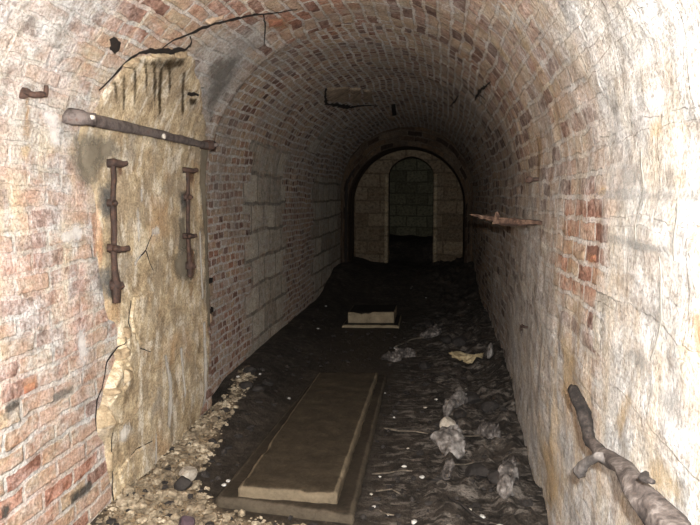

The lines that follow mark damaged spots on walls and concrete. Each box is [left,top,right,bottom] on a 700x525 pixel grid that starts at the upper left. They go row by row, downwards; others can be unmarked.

hole [108,37,121,55]
crack [99,9,298,91]
damp [145,59,186,114]
damp [210,60,235,105]
corrosion [469,212,542,226]
peeling [95,326,143,432]
crack [106,433,114,501]